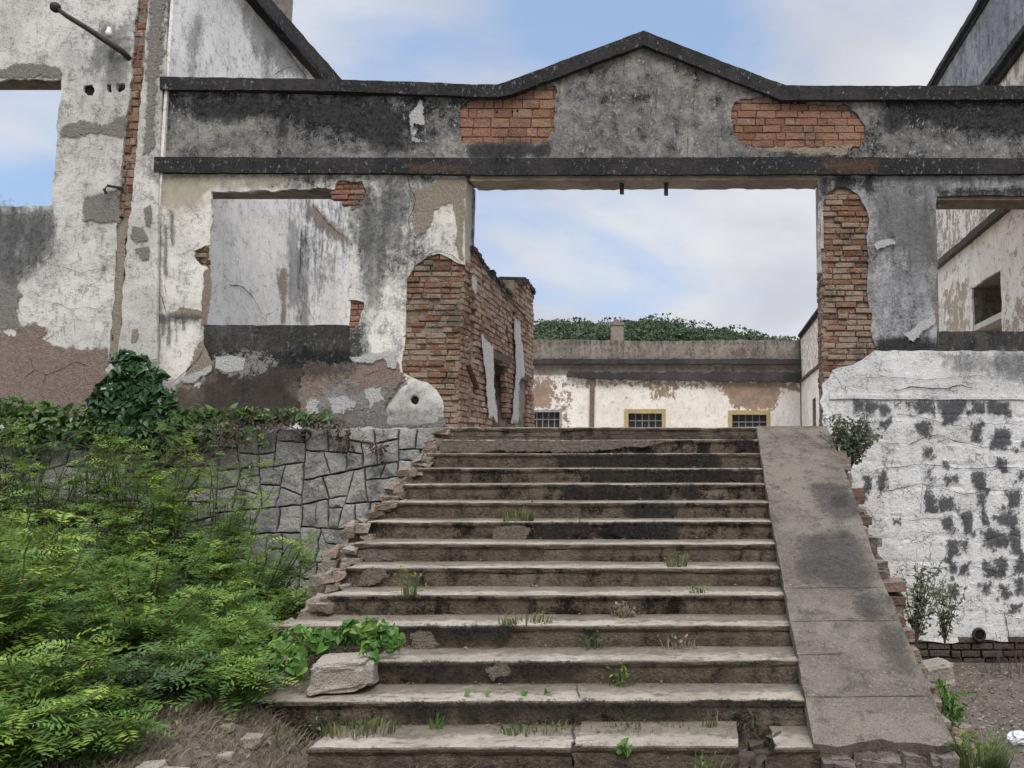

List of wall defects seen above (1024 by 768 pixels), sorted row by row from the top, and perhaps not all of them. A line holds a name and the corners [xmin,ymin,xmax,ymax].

peeling [0,0,168,418]
leakage [190,94,413,152]
spalling [163,176,498,429]
spalling [460,86,557,144]
peeling [511,318,526,424]
spalling [731,98,865,157]
spalling [818,187,896,381]
leakage [787,484,912,673]